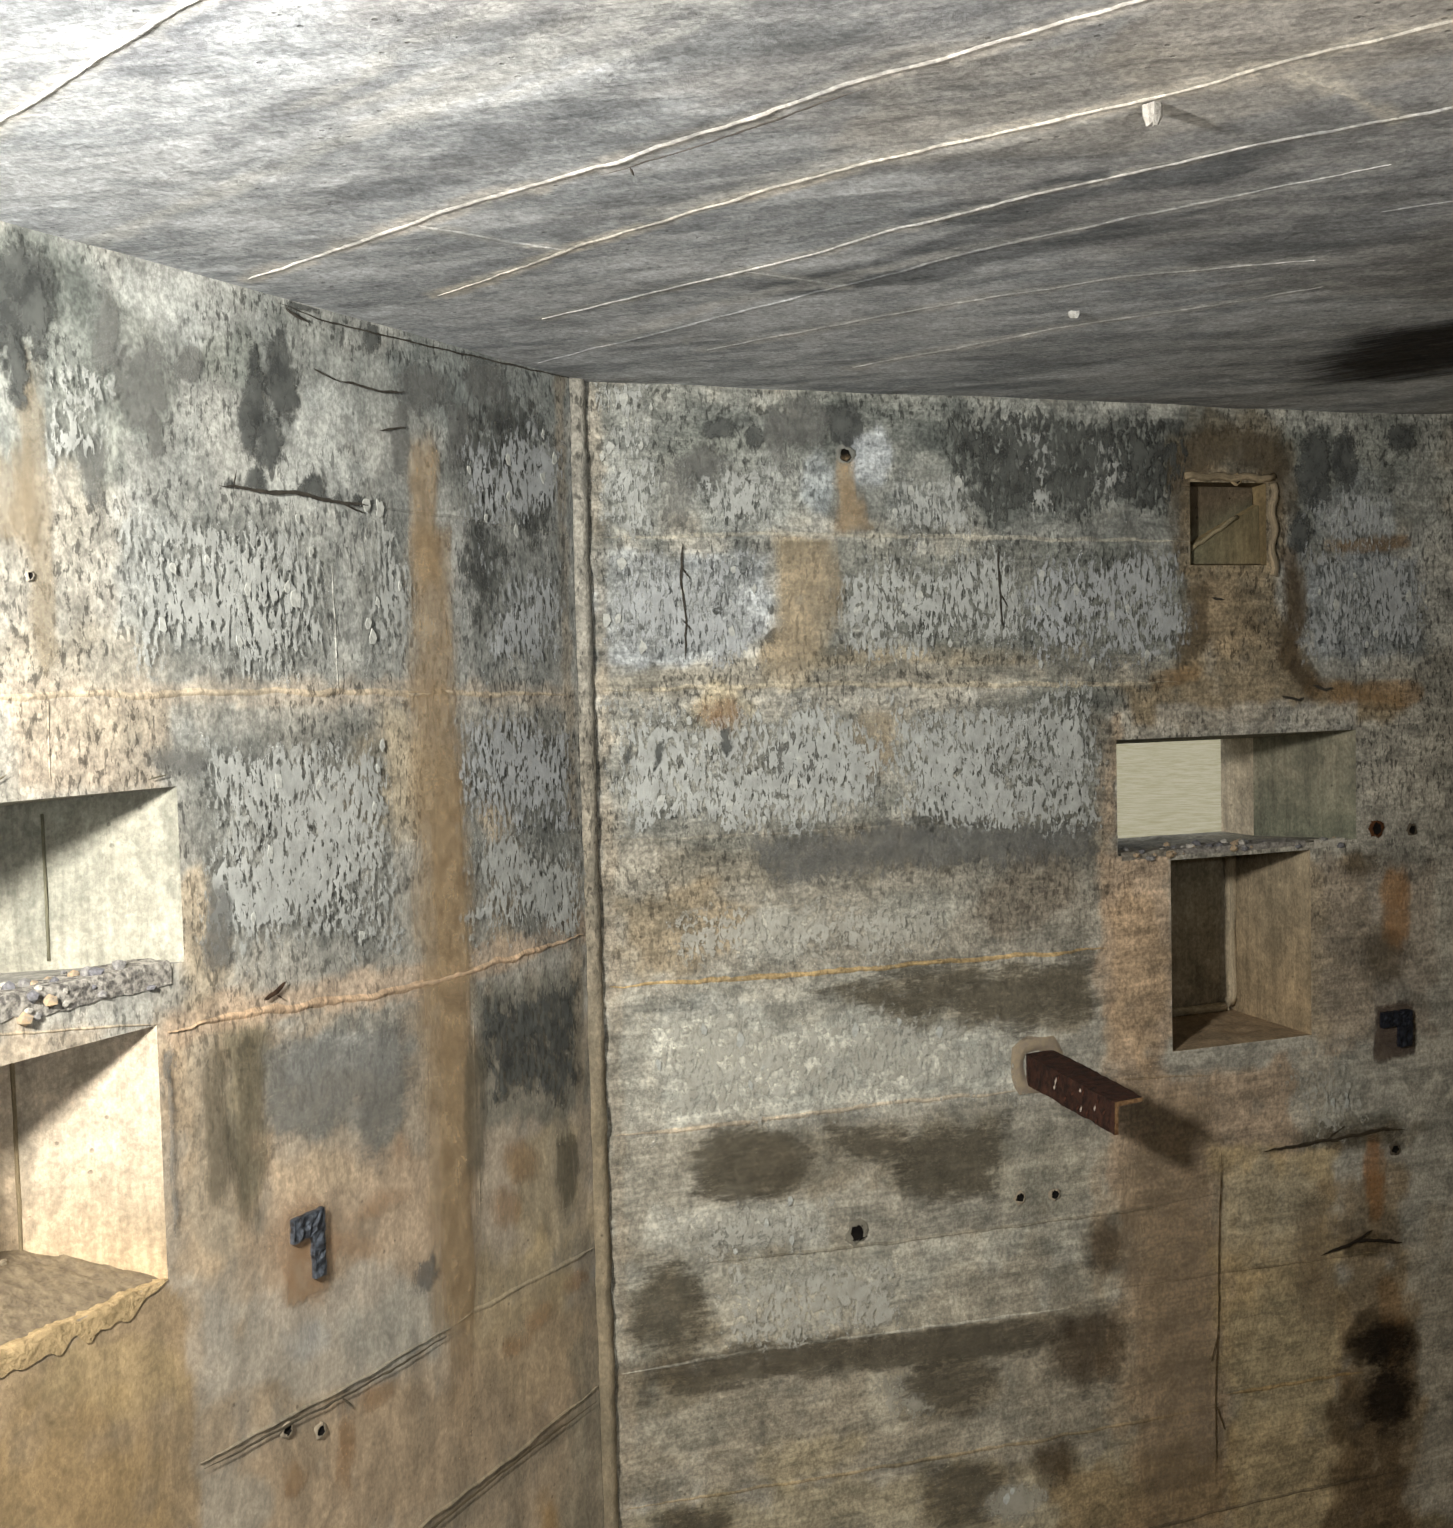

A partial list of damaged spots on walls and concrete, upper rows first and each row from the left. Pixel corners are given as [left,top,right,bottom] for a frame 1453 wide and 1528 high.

crack [601,85,872,176]
leakage [0,229,60,411]
leakage [363,324,380,357]
leakage [224,328,301,494]
crack [219,470,369,513]
leakage [298,474,365,508]
leakage [482,976,581,1108]
crack [1265,1126,1404,1152]
leakage [634,1263,708,1347]
leakage [659,1324,1038,1413]
leakage [1056,1313,1121,1379]
leakage [1347,1321,1418,1432]